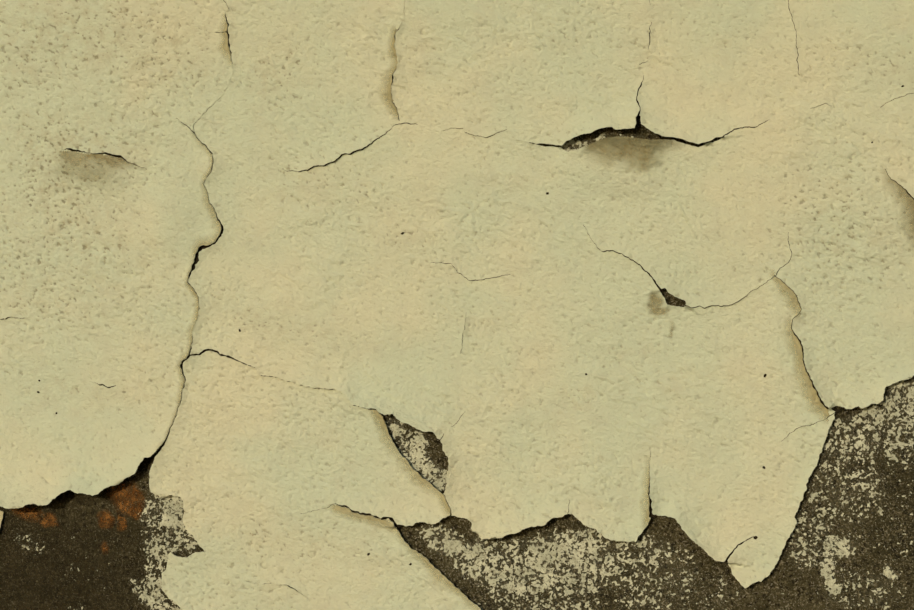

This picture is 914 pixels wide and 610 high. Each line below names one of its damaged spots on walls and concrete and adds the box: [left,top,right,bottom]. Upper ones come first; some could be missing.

crack [287,70,416,172]
crack [534,1,768,152]
crack [177,98,224,309]
crack [583,225,665,292]
peeling [887,169,914,226]
crack [157,336,333,453]
spalling [185,227,914,610]
crack [685,236,839,441]
corrosion [14,507,56,526]
spalling [0,404,228,610]
corrosion [99,482,143,529]
crack [301,503,401,529]